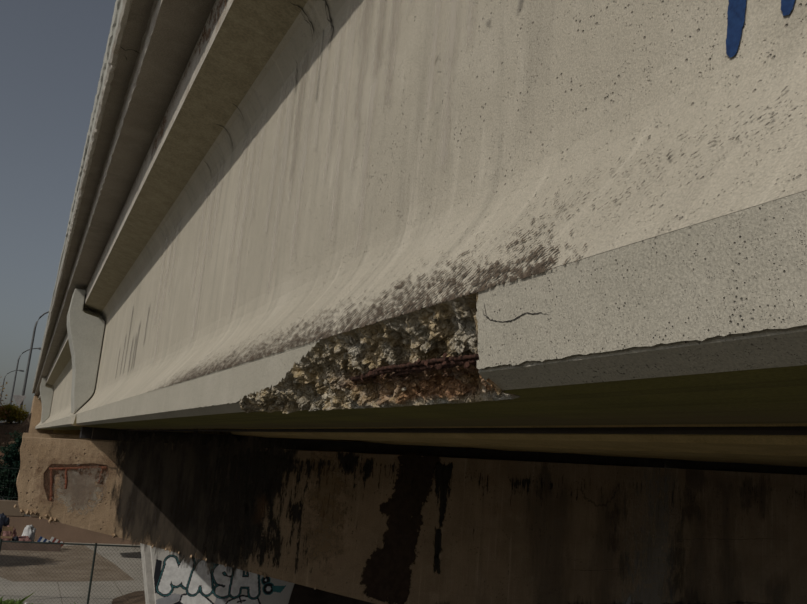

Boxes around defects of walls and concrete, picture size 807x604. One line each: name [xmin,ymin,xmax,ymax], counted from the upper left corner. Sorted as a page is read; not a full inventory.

crack [291,0,334,48]
spalling [239,292,520,414]
damp [149,114,760,392]
crack [482,305,543,322]
damp [112,429,453,604]